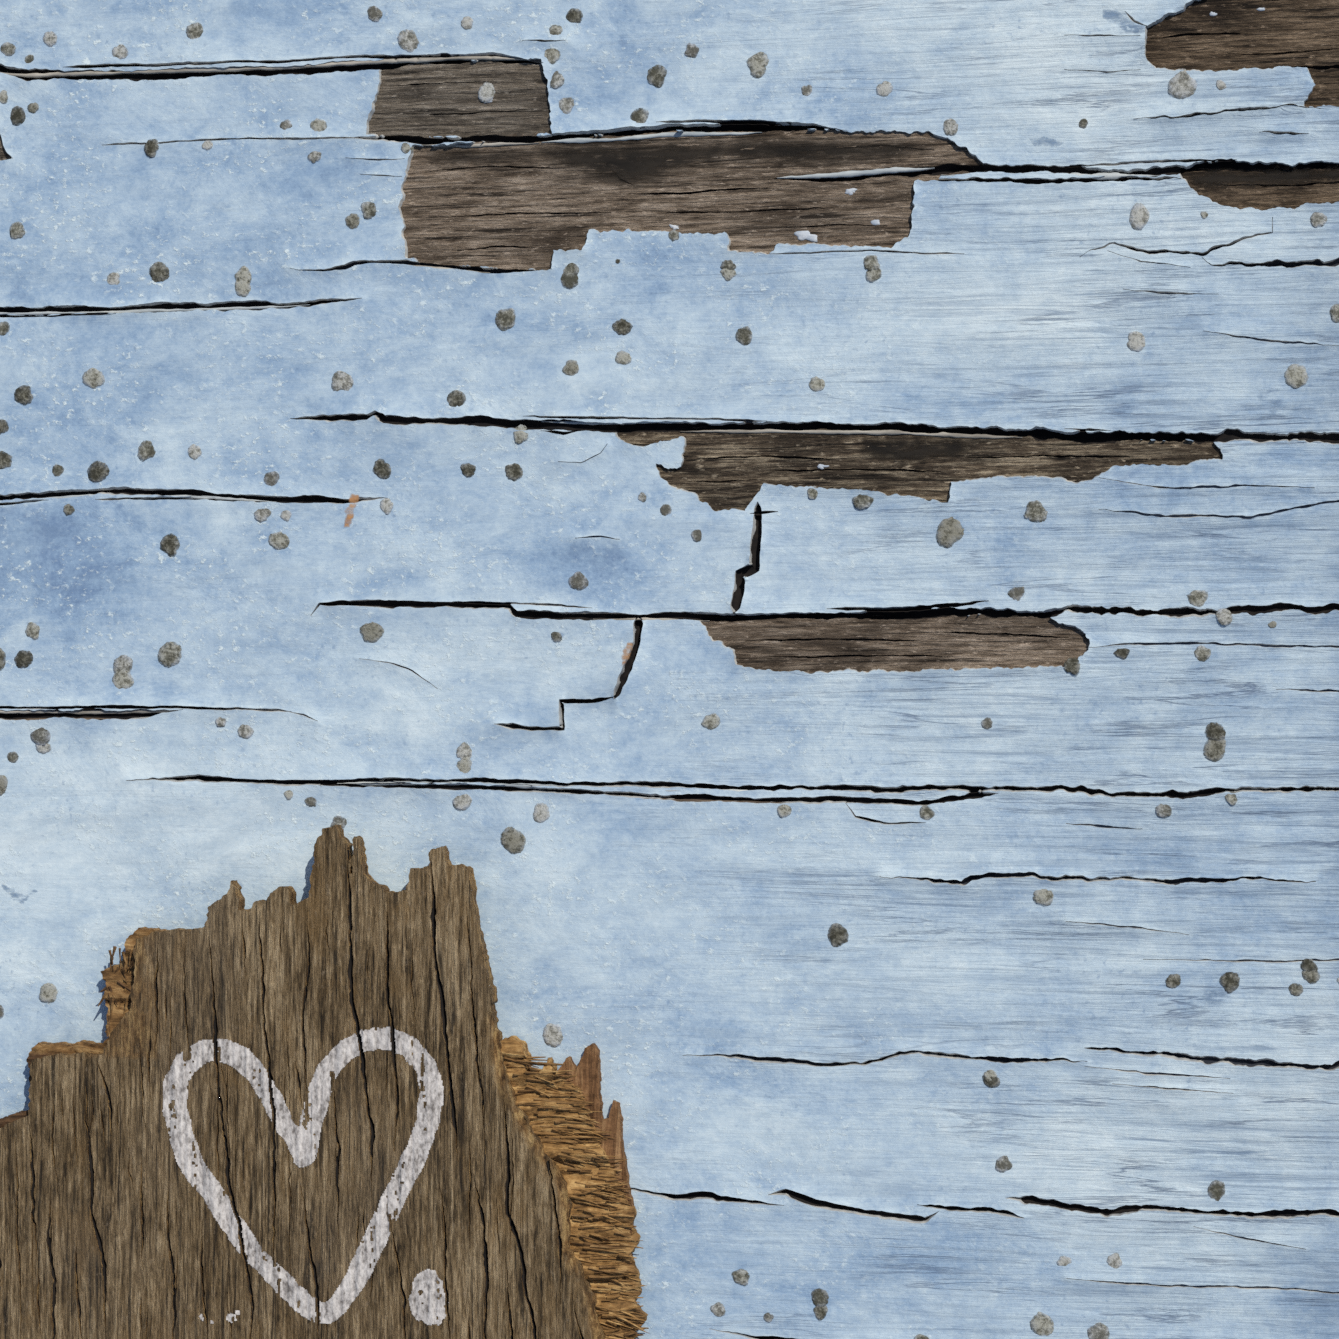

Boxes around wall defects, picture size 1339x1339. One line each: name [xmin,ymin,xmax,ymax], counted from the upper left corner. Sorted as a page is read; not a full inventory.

crack [0,40,554,81]
peeling [1145,0,1339,108]
peeling [0,135,12,160]
peeling [369,59,983,271]
peeling [1181,169,1339,211]
crack [296,411,1339,463]
crack [0,489,364,505]
peeling [617,429,1223,511]
crack [314,504,1339,731]
peeling [701,614,1089,674]
crack [166,775,1339,829]
crack [635,1188,1339,1249]